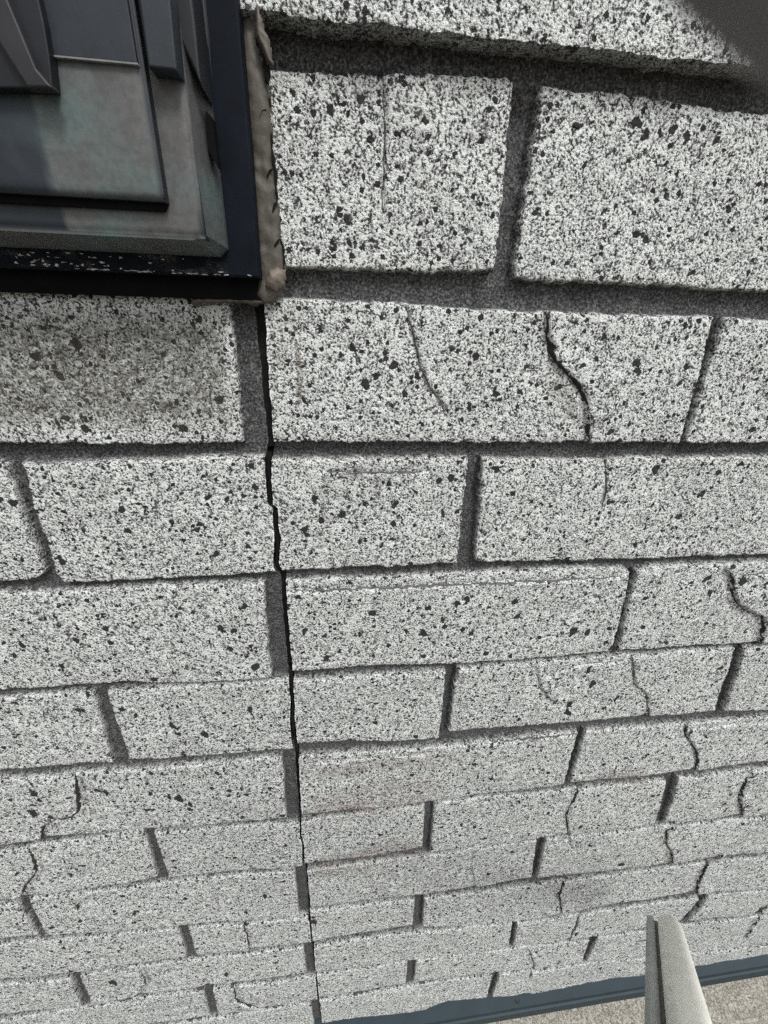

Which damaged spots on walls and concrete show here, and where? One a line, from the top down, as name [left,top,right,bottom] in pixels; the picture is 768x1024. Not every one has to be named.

crack [255,304,625,1014]
crack [632,657,650,717]
crack [681,719,703,770]
crack [738,773,759,815]